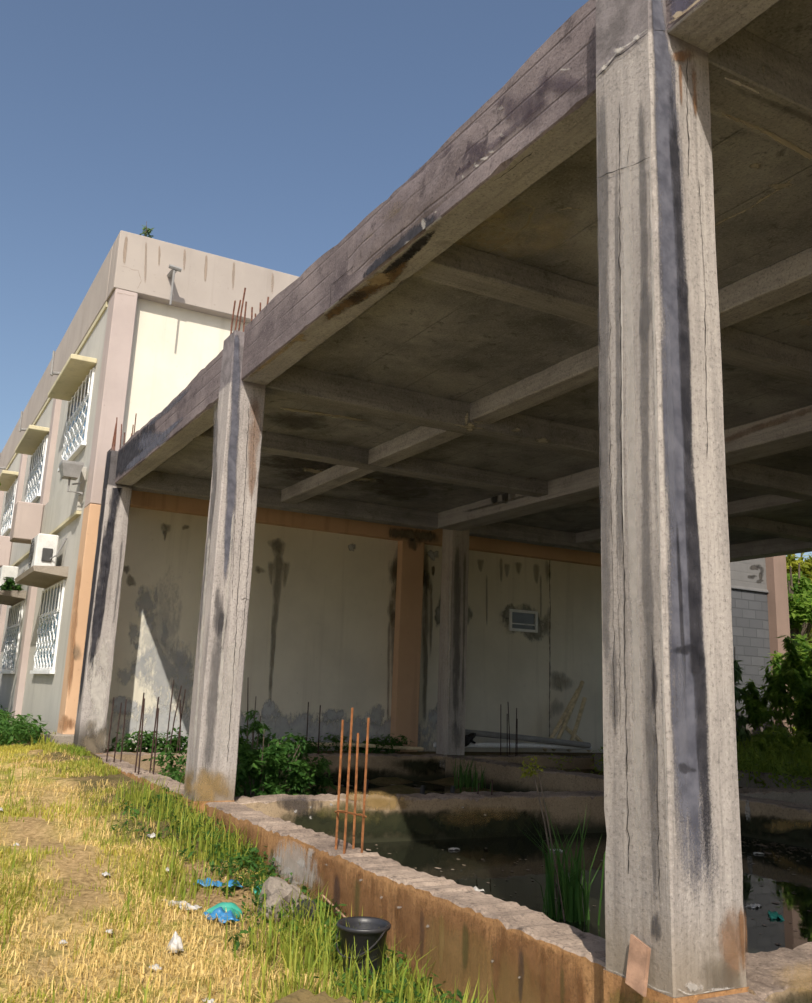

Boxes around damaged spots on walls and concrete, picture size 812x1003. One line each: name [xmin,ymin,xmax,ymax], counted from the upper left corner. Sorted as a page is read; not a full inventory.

corrosion [675,51,697,113]
leakage [78,391,186,754]
leakage [257,539,286,700]
spalling [326,215,436,320]
leakage [389,528,438,715]
leakage [597,109,610,656]
crack [596,108,647,874]
leakage [639,0,714,889]
crack [651,636,660,897]